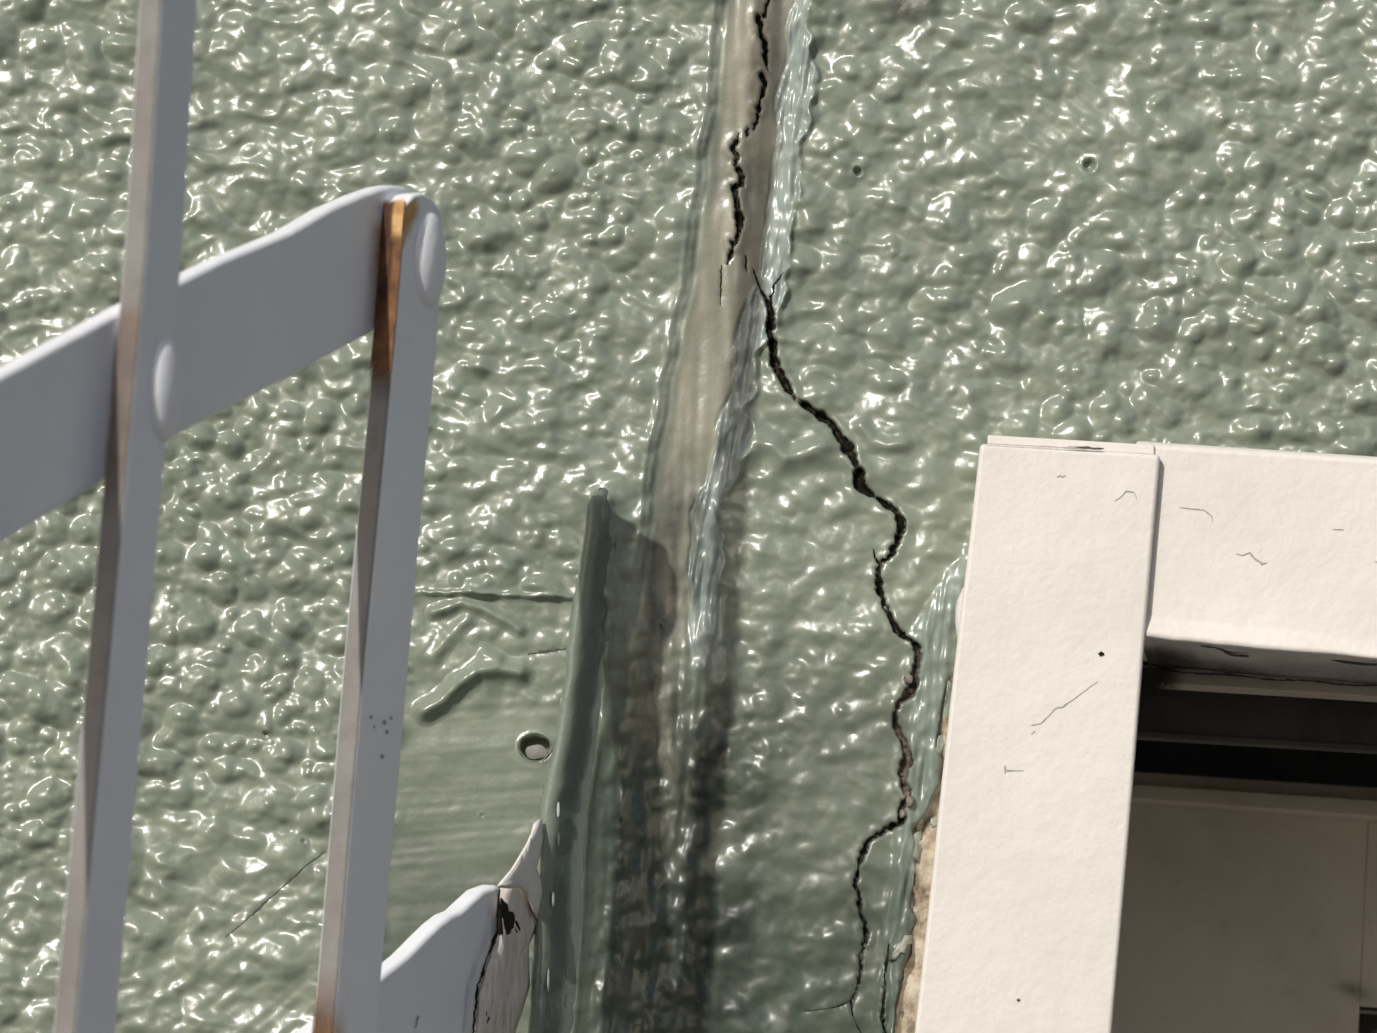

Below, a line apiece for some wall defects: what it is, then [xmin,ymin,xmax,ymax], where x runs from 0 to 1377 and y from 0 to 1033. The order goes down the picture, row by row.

rust [369,199,417,377]
crack [720,0,922,1033]
peeling [935,677,953,759]
peeling [476,818,544,1033]
peeling [889,779,942,1033]